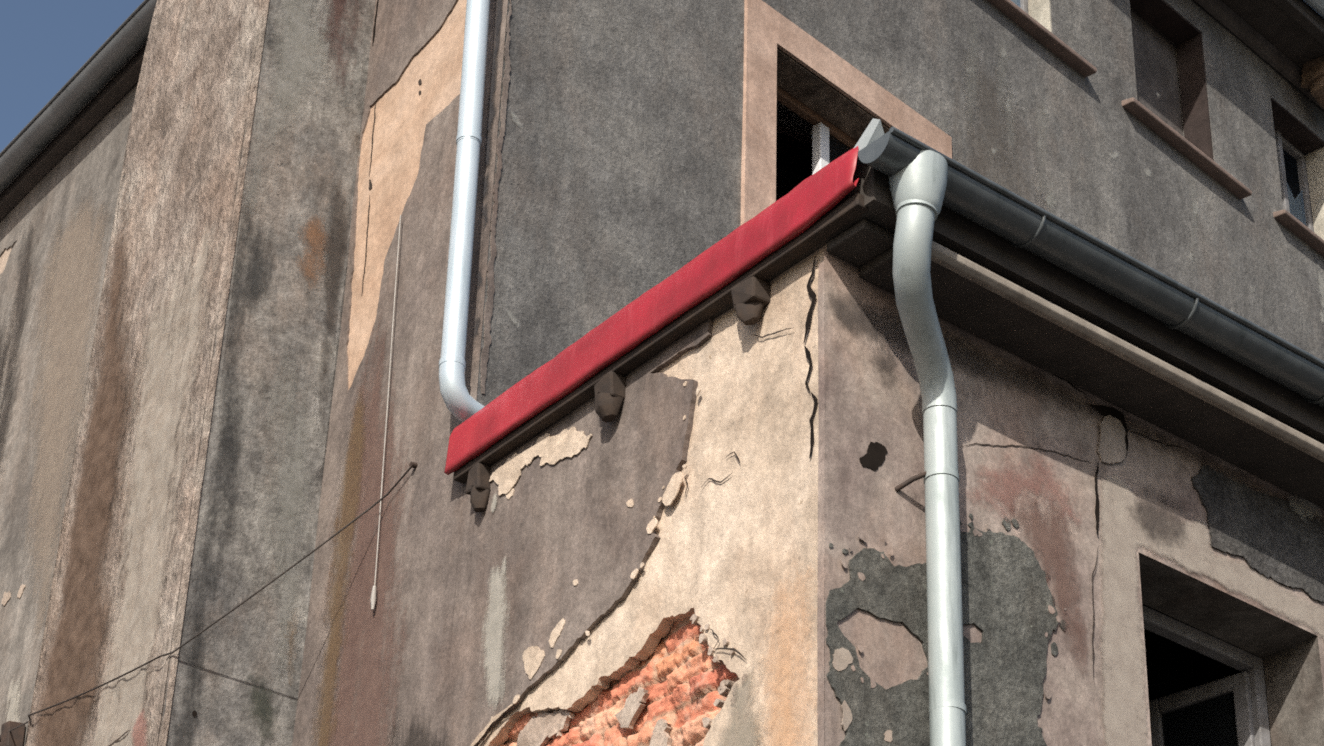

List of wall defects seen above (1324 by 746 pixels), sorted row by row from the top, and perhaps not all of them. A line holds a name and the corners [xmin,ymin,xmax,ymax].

flaking render [0,244,15,274]
water stain [7,679,20,722]
flaking render [2,584,26,606]
water stain [0,232,32,442]
water stain [31,194,208,746]
flaking render [347,0,467,390]
flaking render [470,244,930,746]
crack [756,256,818,458]
flaking render [960,513,1067,746]
crack [959,374,1188,684]
flaking render [1100,465,1324,746]